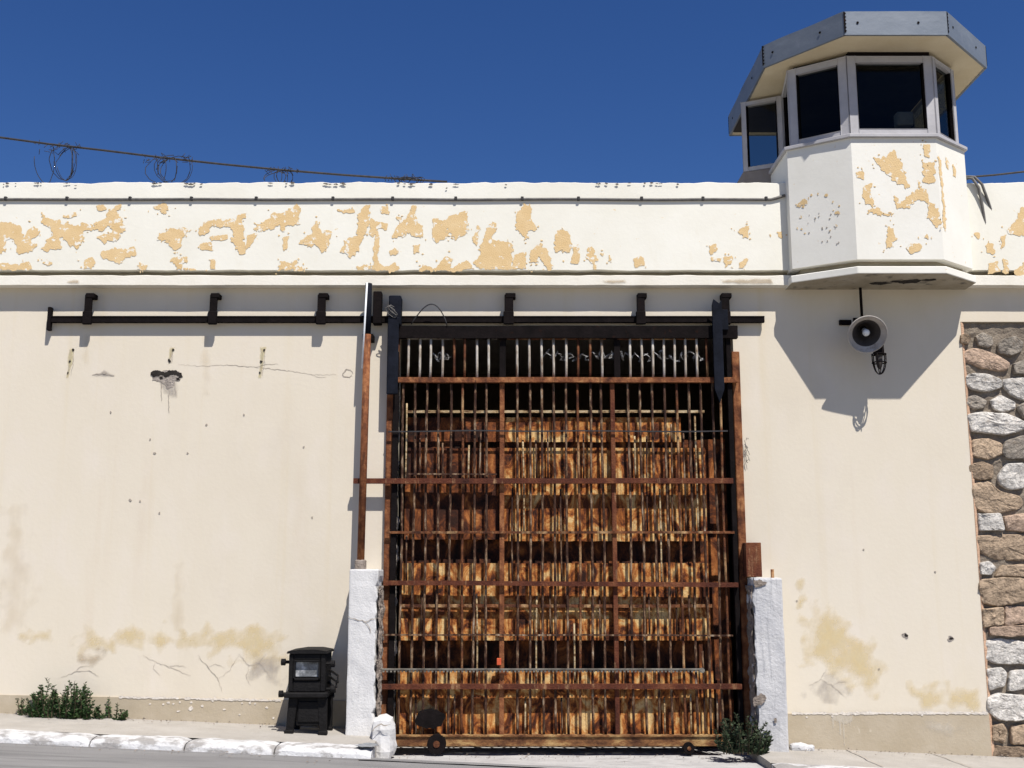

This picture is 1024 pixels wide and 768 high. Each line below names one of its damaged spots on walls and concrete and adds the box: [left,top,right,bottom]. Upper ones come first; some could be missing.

peeling [0,204,148,273]
peeling [148,203,612,274]
peeling [633,256,646,268]
peeling [706,244,748,270]
peeling [769,193,840,244]
peeling [856,140,956,254]
peeling [972,207,1024,276]
spalling [151,370,183,411]
crack [143,654,273,702]